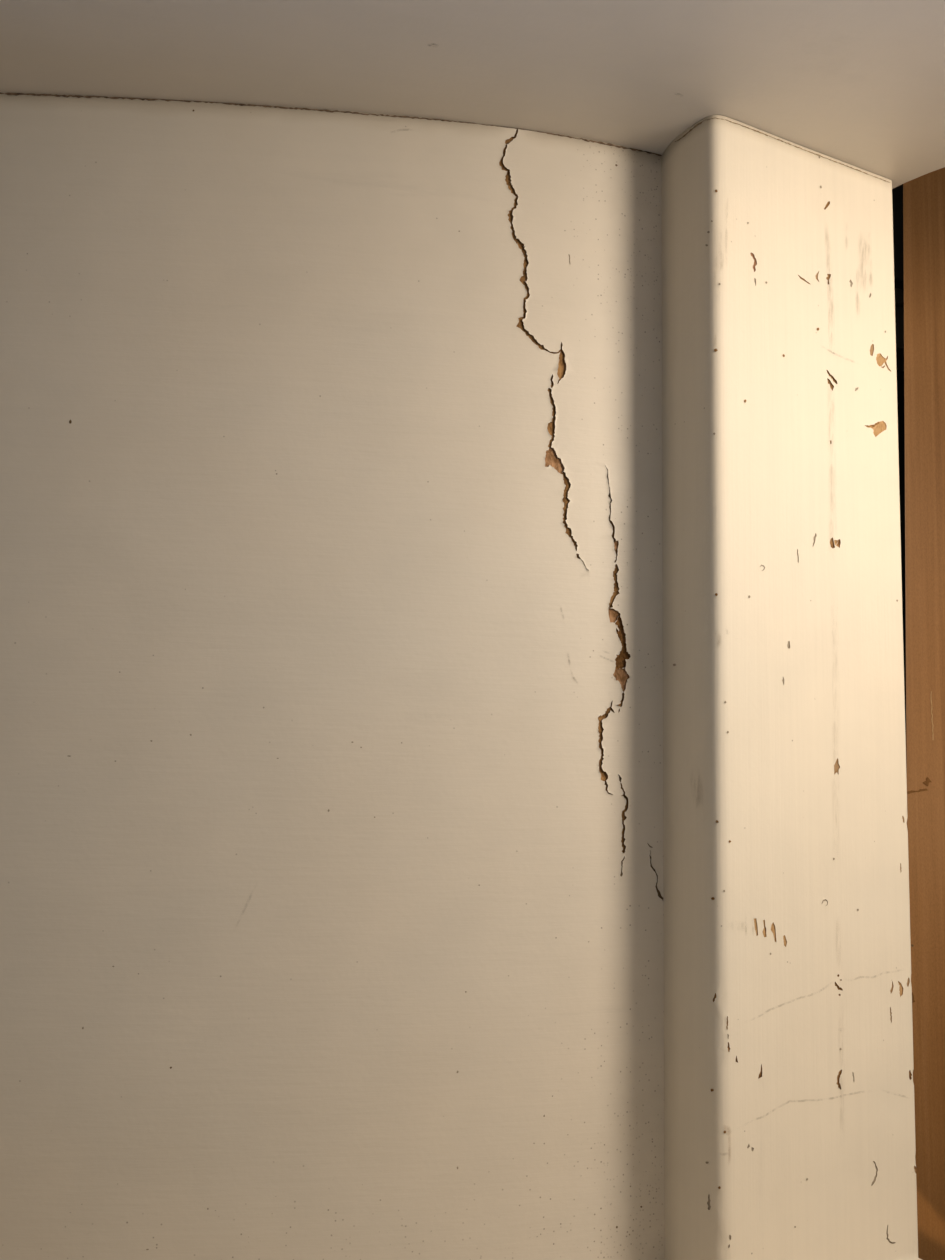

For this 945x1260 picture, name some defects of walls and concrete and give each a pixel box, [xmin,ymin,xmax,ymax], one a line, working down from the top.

peeling [870,344,891,371]
peeling [865,421,886,437]
crack [0,93,890,900]
peeling [754,918,787,955]